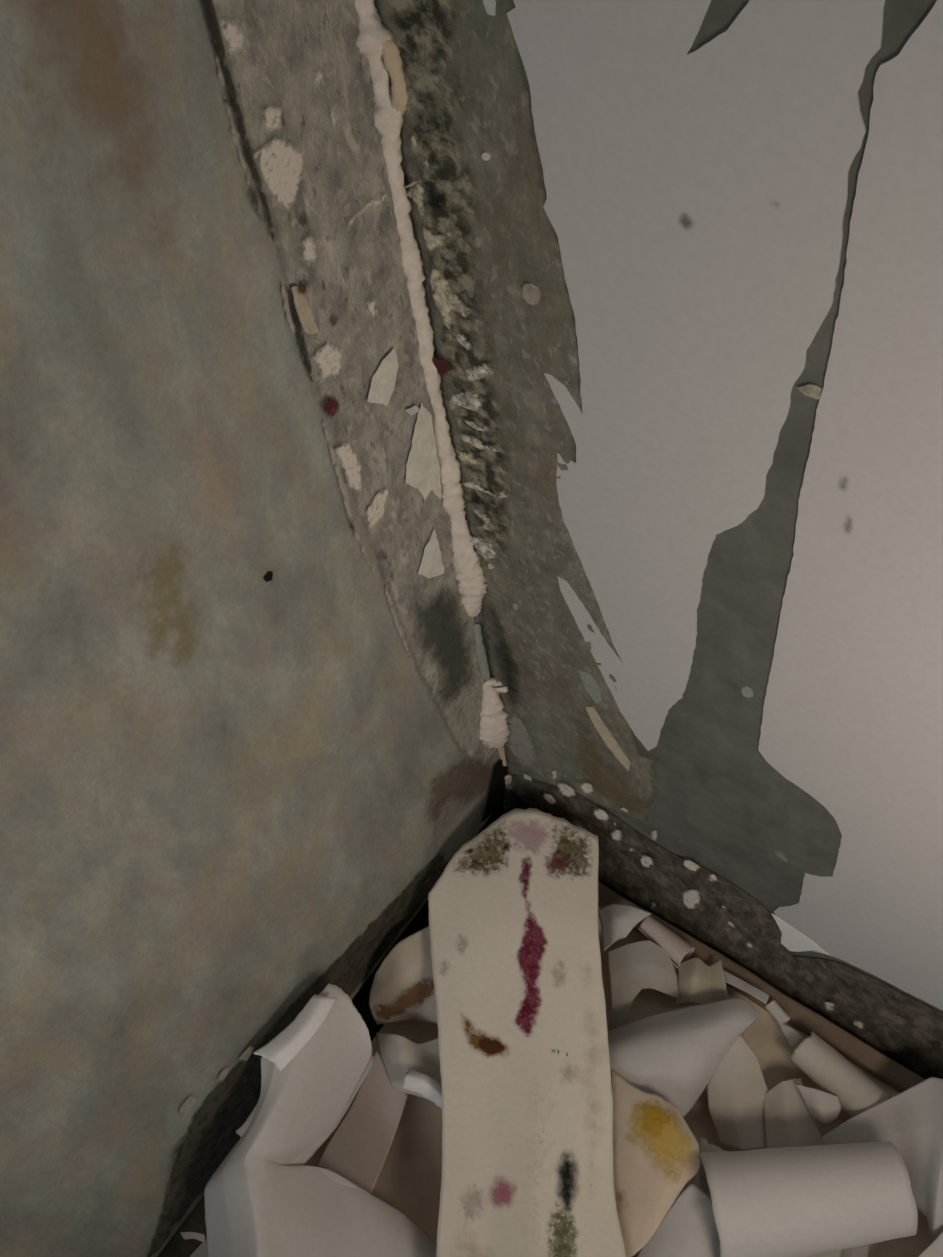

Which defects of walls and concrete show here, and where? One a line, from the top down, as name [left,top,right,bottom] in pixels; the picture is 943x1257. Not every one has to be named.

leakage [419,596,469,700]
leakage [386,0,510,572]
peeling [212,0,943,1079]